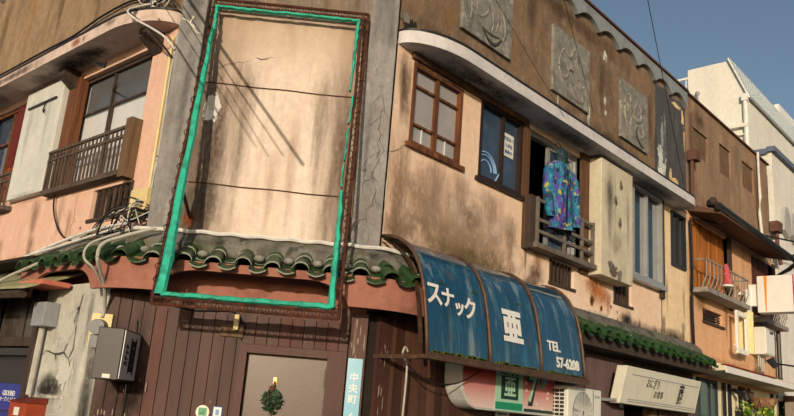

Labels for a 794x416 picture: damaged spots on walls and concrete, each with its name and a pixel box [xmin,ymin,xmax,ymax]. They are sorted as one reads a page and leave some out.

damp [199,113,224,183]
peeling [203,92,222,122]
crack [357,86,405,246]
flaking render [655,83,686,190]
crack [40,295,83,366]
damp [39,375,62,399]
damp [78,358,92,416]